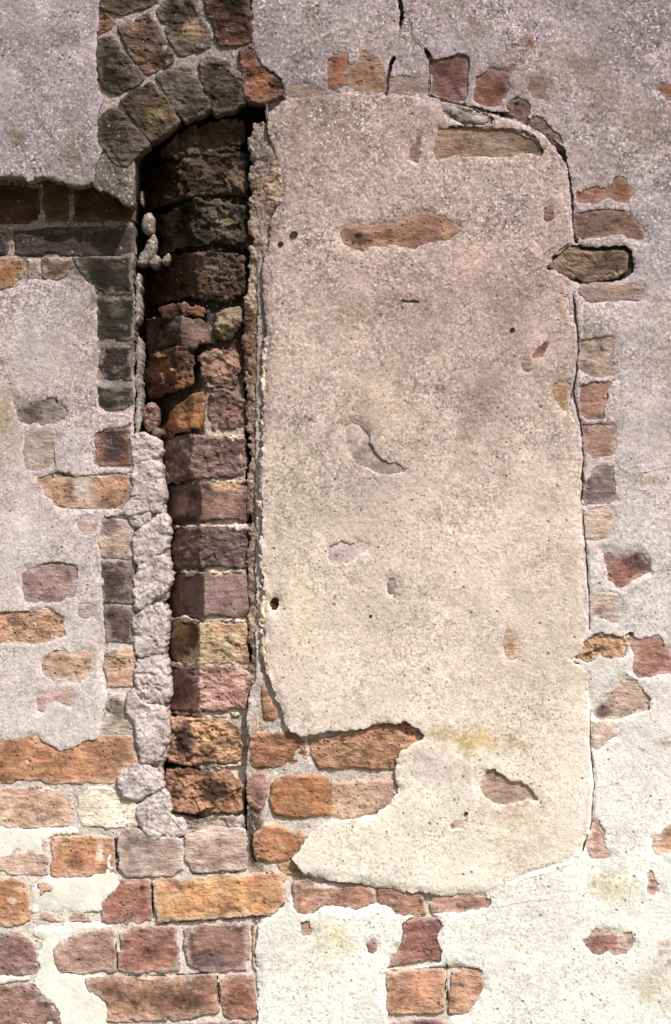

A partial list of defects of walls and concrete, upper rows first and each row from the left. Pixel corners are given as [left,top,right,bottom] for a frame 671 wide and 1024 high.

peeling [327,50,566,163]
peeling [547,176,645,303]
crack [386,0,591,630]
peeling [13,397,68,474]
peeling [345,423,405,475]
peeling [77,516,103,535]
peeling [552,336,671,751]
peeling [0,561,96,713]
peeling [246,685,491,1024]
peeling [479,769,538,805]
peeling [586,818,611,859]
peeling [652,825,671,856]